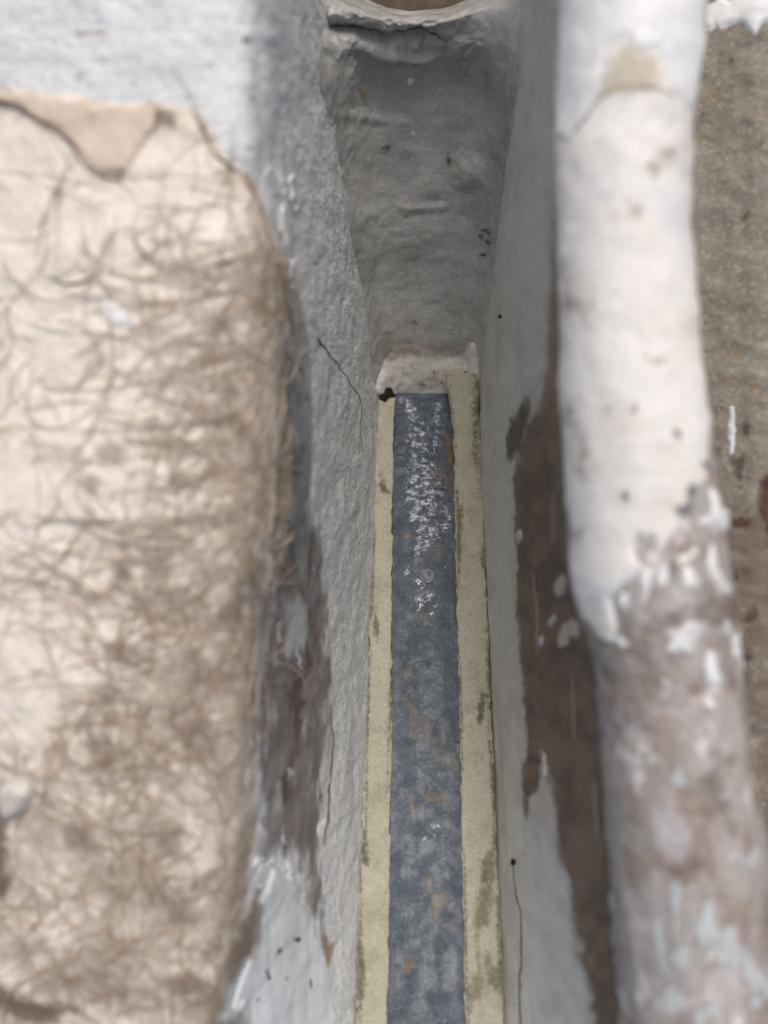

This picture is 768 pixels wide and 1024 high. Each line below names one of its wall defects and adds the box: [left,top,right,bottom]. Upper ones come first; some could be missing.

crack [283,282,363,451]
peeling [538,0,768,648]
water stain [259,525,331,922]
water stain [513,413,619,1024]
peeling [667,620,709,654]
peeling [704,651,723,708]
peeling [725,619,752,670]
crack [510,858,522,1024]
peeling [653,882,720,1024]
peeling [695,898,768,1009]